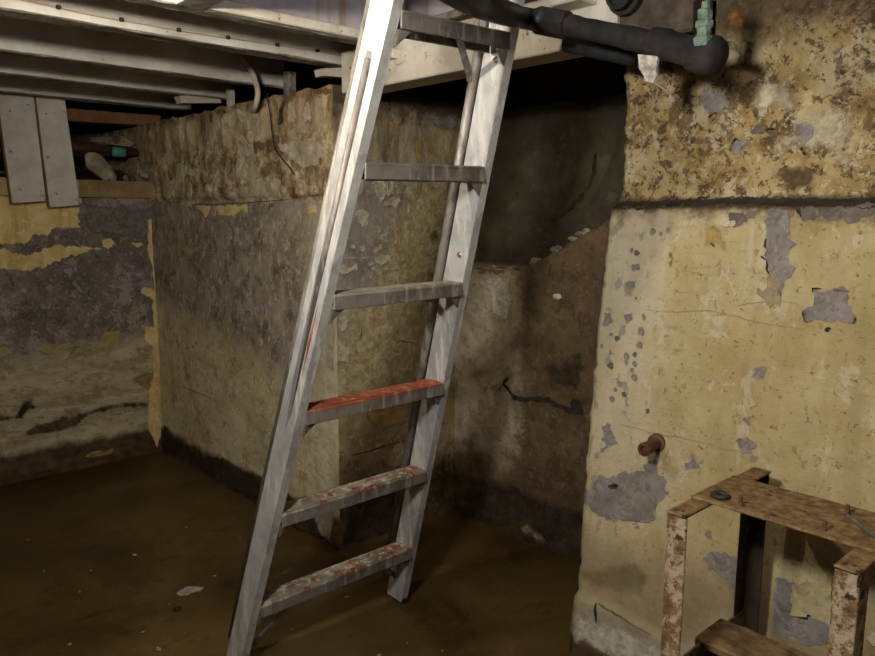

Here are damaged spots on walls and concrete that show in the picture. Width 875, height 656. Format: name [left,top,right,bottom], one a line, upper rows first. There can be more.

peeling [730,123,778,155]
peeling [0,196,115,271]
peeling [719,202,875,308]
peeling [802,286,856,332]
peeling [131,219,162,447]
leakage [0,401,35,420]
leakage [27,403,147,435]
crack [499,374,584,416]
peeling [735,437,757,463]
peeling [585,459,667,523]